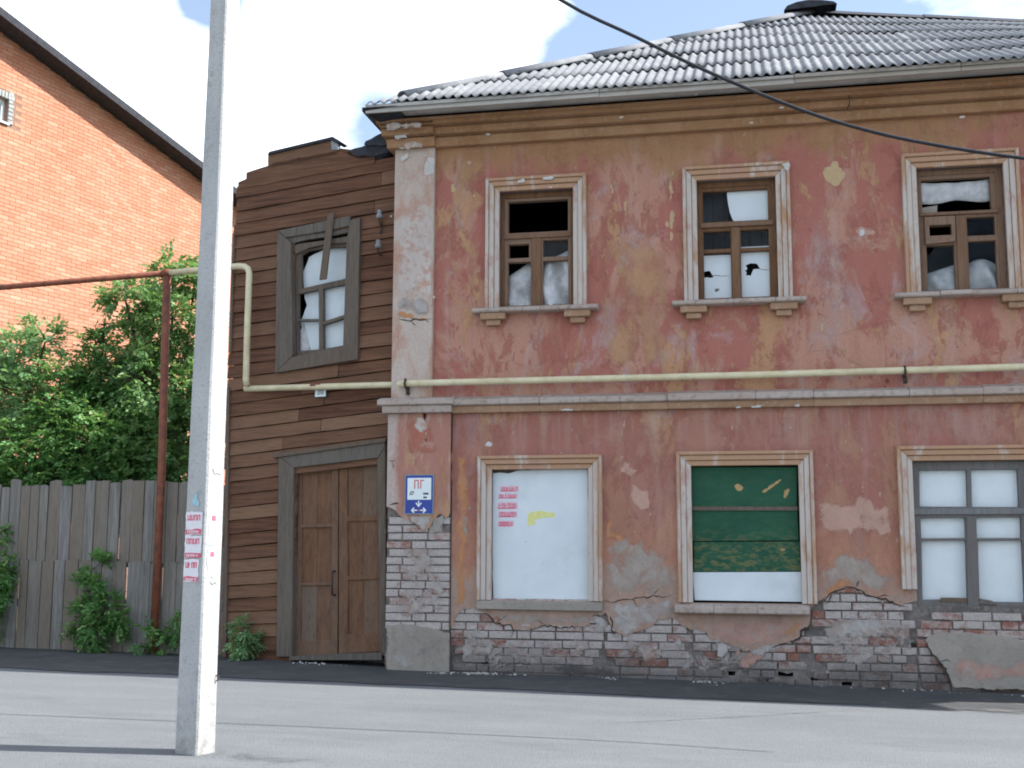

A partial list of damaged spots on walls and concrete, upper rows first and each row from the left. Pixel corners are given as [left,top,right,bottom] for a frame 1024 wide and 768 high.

peeling [823,161,845,186]
flaking render [384,454,1024,693]
crack [607,593,673,634]